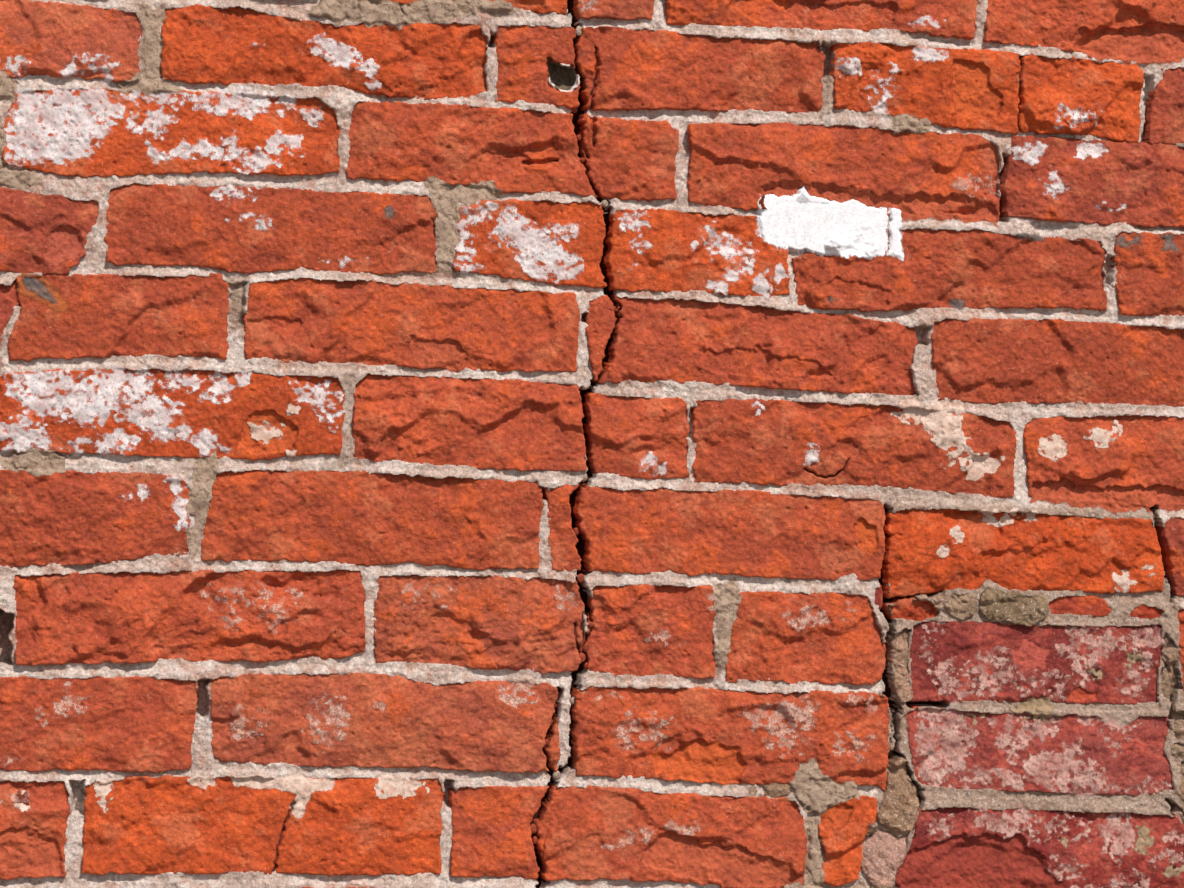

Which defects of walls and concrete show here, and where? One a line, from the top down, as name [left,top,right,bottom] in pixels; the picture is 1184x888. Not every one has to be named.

crack [522,0,617,888]
crack [878,569,939,710]
efflorescence [914,619,1184,888]